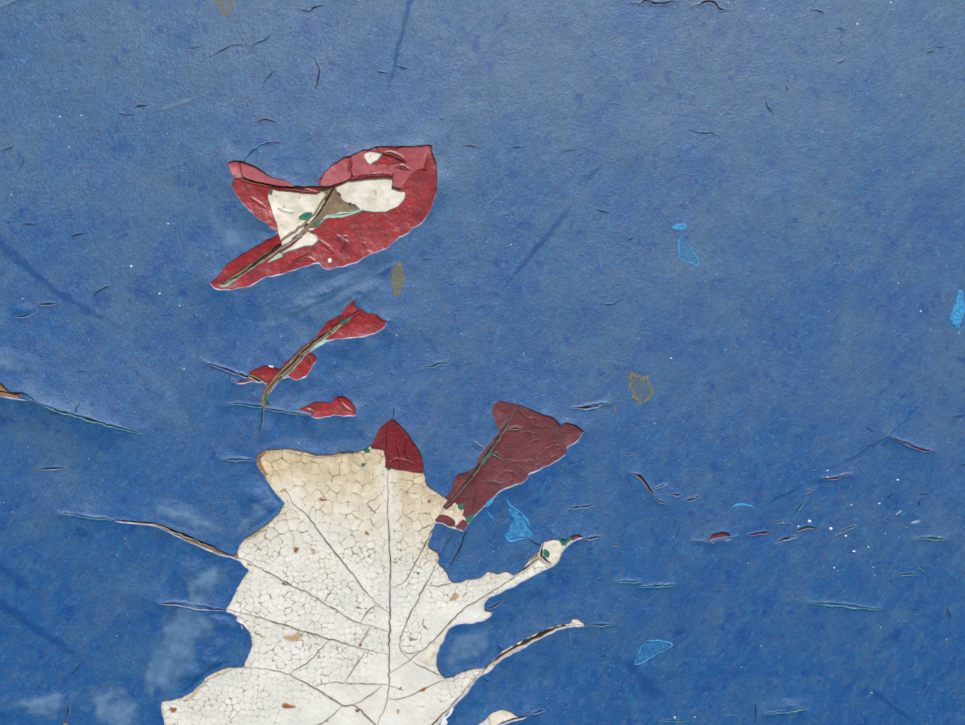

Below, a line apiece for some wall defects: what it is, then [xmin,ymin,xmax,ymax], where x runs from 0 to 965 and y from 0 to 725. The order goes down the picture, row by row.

peeling [201,294,387,436]
peeling [211,140,437,290]
crack [57,403,620,725]
peeling [161,401,583,725]